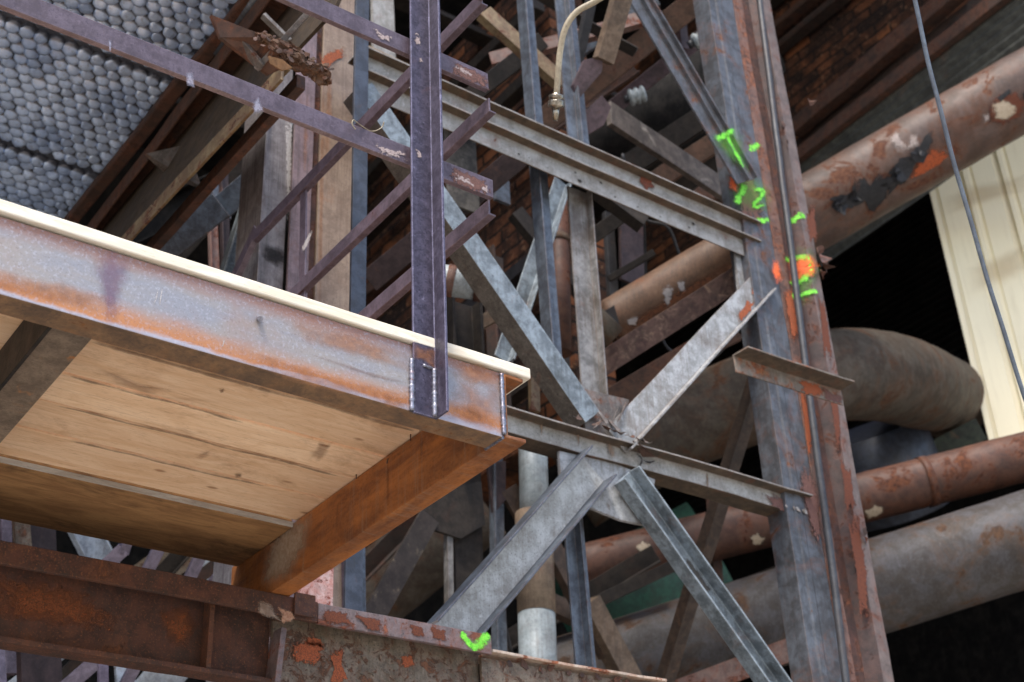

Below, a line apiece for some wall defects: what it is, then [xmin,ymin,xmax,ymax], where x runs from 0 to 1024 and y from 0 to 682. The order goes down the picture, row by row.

corrosion [911,148,955,178]
corrosion [806,204,834,272]
corrosion [739,290,754,320]
corrosion [784,287,798,344]
corrosion [819,298,832,361]
corrosion [762,379,870,624]
peeling [260,603,295,623]
peeling [324,610,382,633]
peeling [410,624,446,641]
peeling [293,637,348,682]